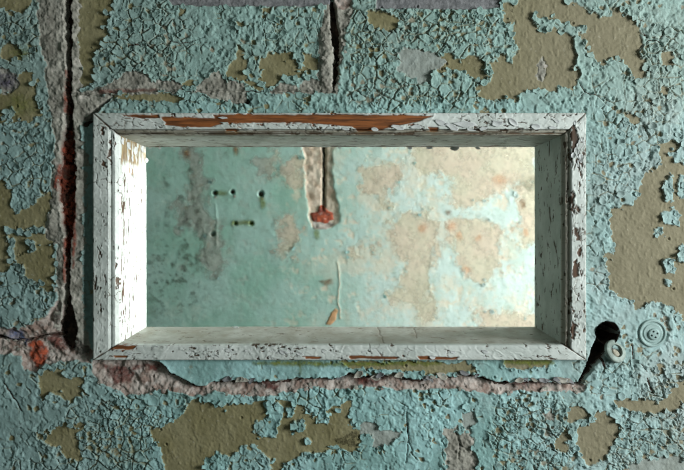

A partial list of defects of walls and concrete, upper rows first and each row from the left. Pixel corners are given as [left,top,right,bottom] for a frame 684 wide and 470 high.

peeling [77,0,334,106]
peeling [0,0,59,297]
rust [54,140,77,280]
peeling [344,0,684,322]
peeling [0,301,684,470]
crack [577,341,606,383]